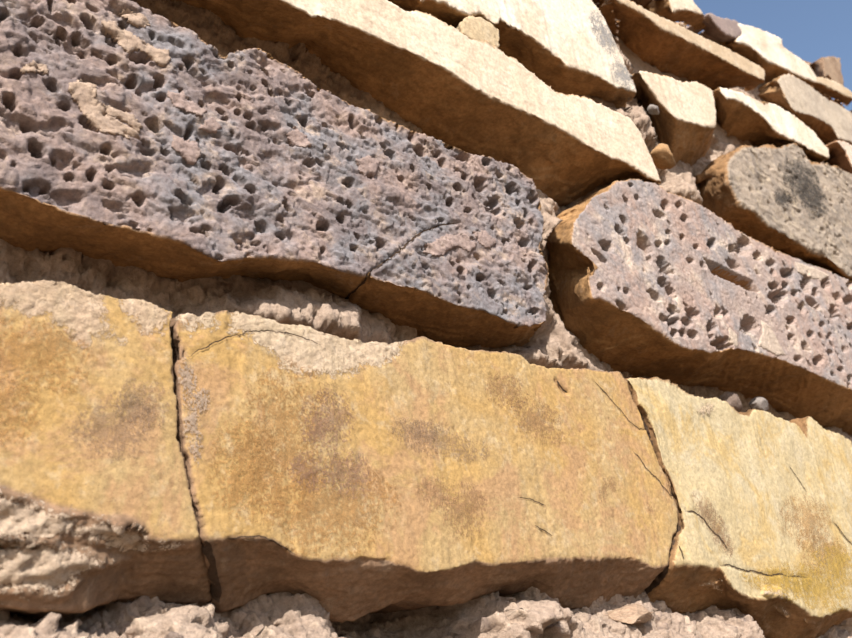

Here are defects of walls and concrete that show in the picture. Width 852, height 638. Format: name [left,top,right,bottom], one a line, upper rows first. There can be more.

crack [345,223,455,299]
crack [171,330,321,393]
crack [595,382,805,594]
crack [202,535,294,602]